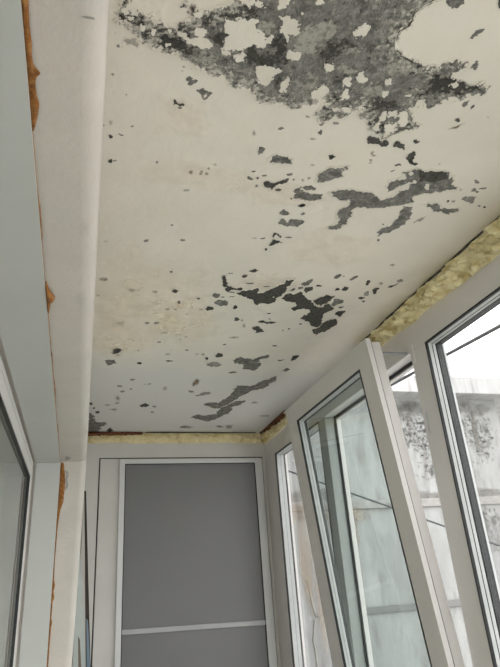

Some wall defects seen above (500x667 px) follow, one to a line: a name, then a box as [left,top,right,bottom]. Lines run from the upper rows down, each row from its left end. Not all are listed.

peeling [113,0,491,241]
peeling [206,269,358,335]
peeling [229,355,269,373]
peeling [188,368,290,428]